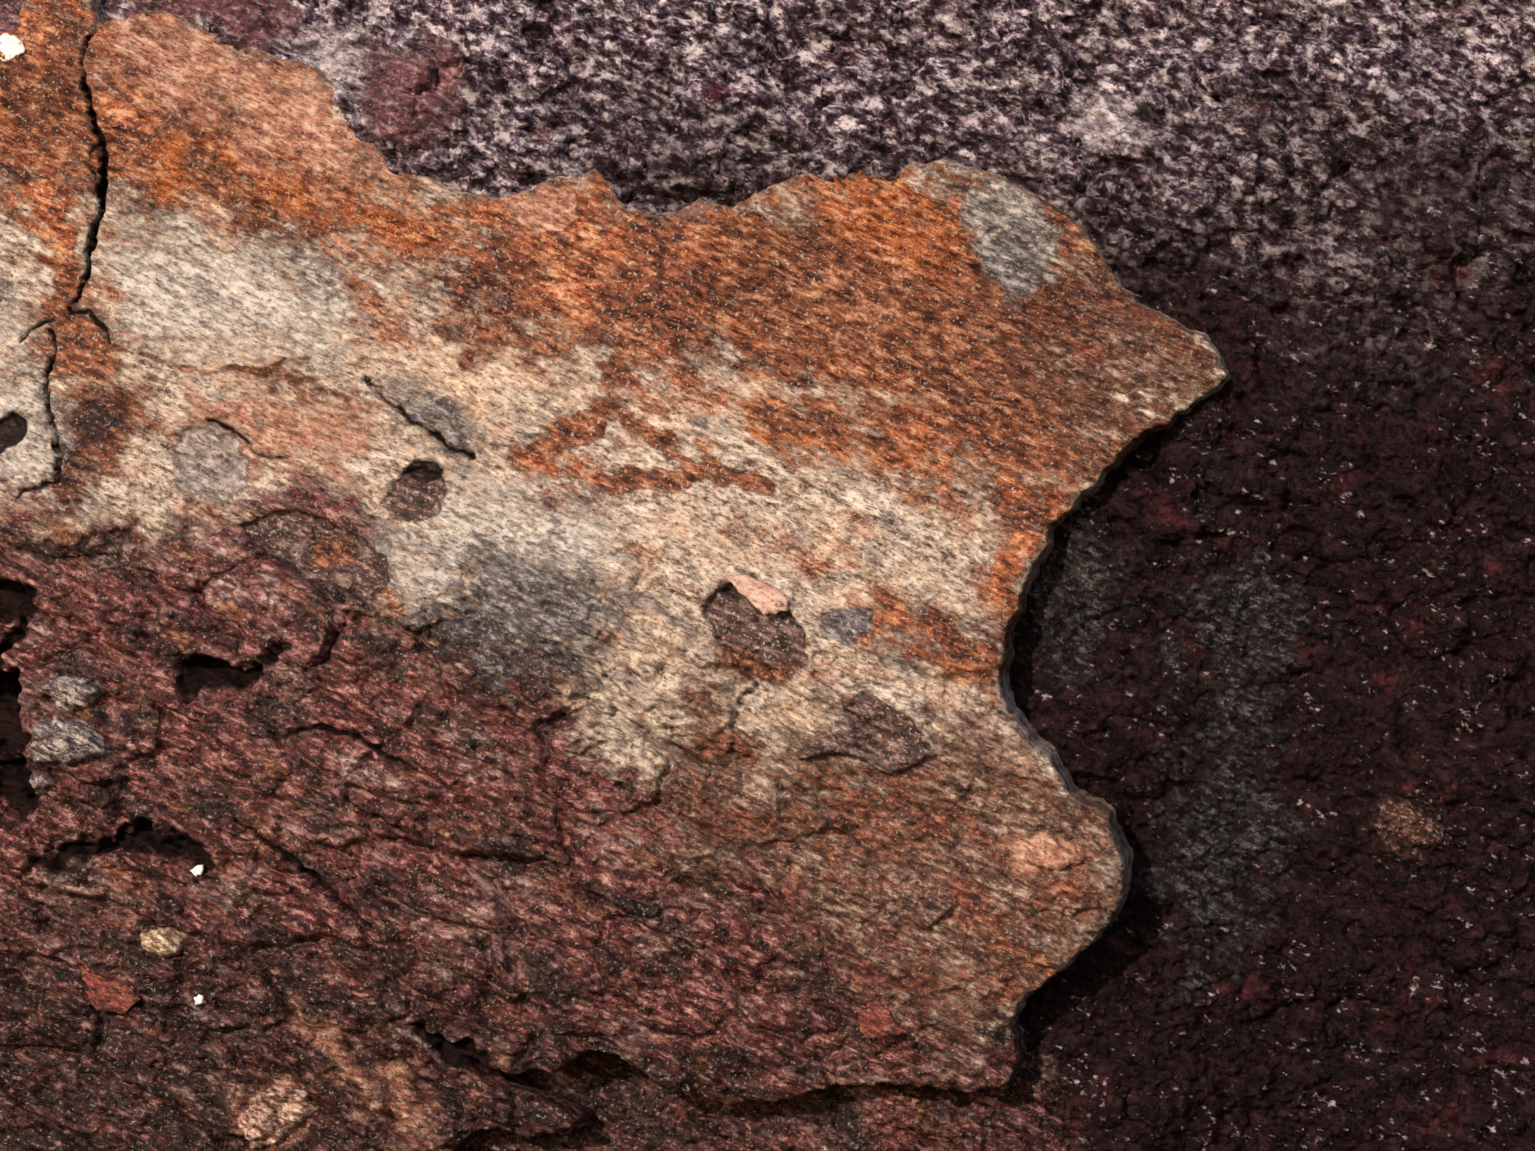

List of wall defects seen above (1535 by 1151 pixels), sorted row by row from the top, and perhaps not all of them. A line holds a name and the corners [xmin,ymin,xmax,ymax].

peeling [0,33,26,61]
spalling [508,190,580,234]
crack [15,28,111,500]
spalling [0,412,27,454]
crack [380,393,475,459]
spalling [381,459,446,521]
rust [0,0,1227,1034]
spalling [242,510,390,599]
spalling [703,575,808,686]
peeling [803,694,930,771]
peeling [190,865,204,876]
peeling [1017,834,1077,867]